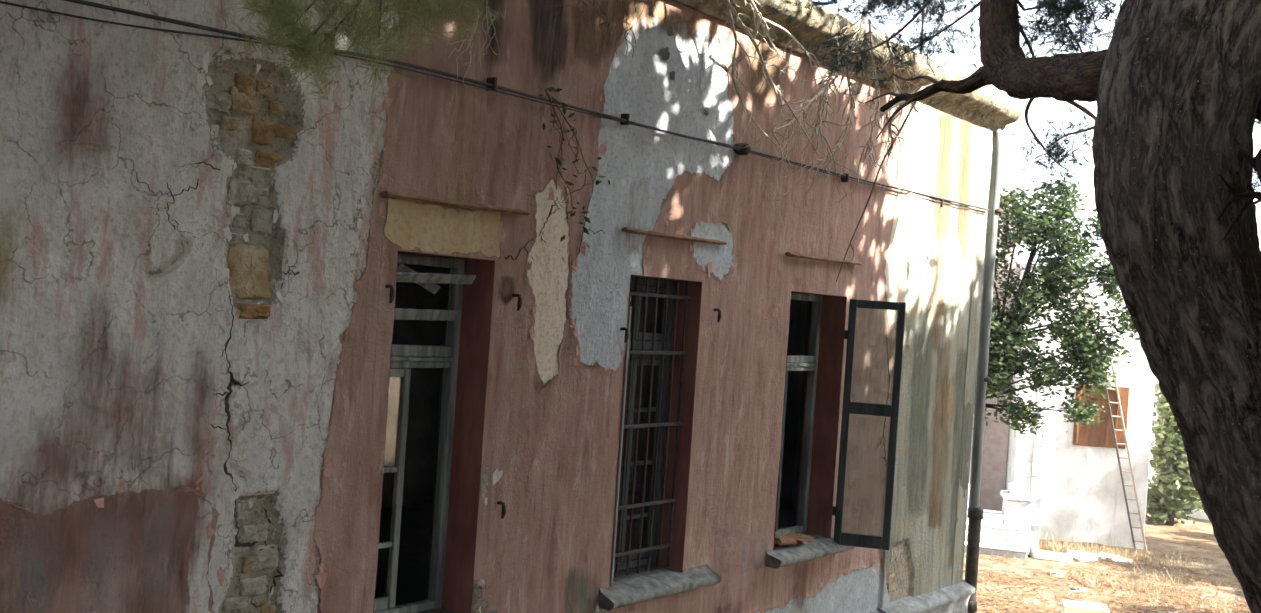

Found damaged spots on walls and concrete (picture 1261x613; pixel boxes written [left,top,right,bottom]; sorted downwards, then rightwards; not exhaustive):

crack [210,296,284,608]
peeling [0,0,506,613]
peeling [520,8,740,400]
peeling [725,537,916,613]